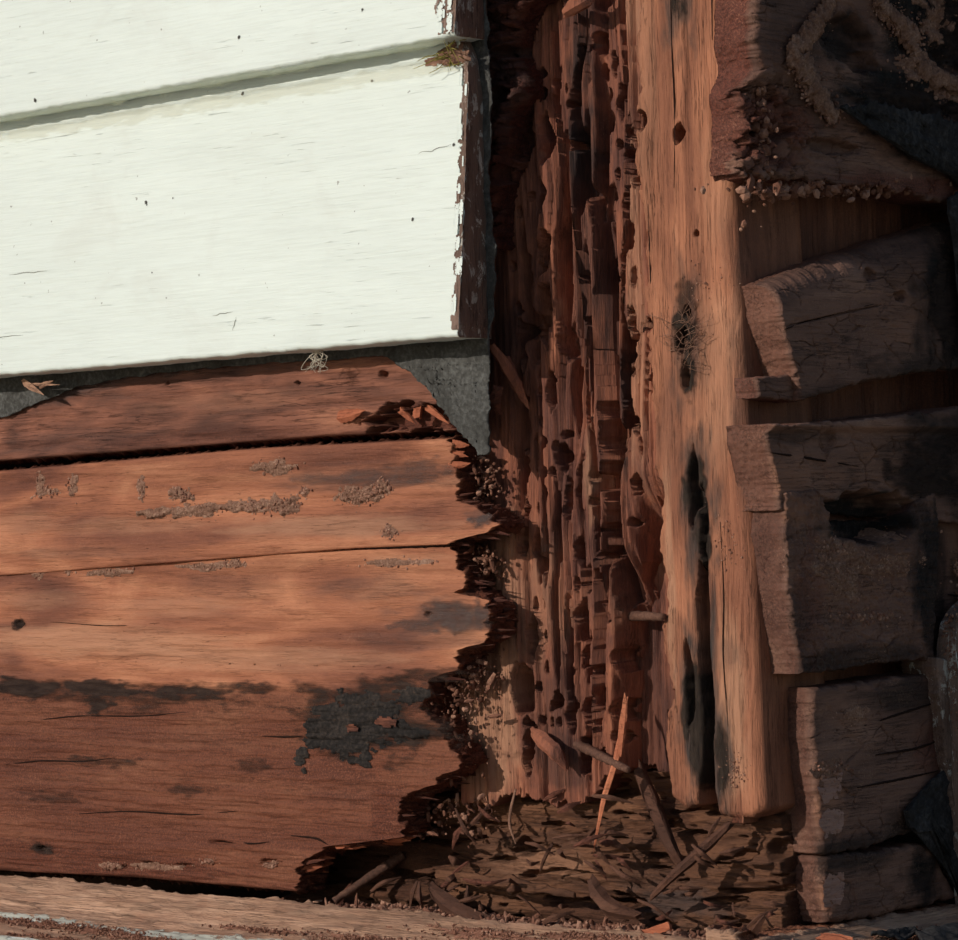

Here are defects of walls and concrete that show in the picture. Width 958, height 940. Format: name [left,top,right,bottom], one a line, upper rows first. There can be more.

peeling [434,0,456,35]
peeling [450,61,469,330]
crack [784,304,873,330]
leakage [681,456,712,571]
leakage [0,675,274,715]
leakage [292,669,459,774]
leakage [680,663,729,793]
spalling [818,771,844,839]
spalling [823,872,845,909]
peeling [0,912,283,940]